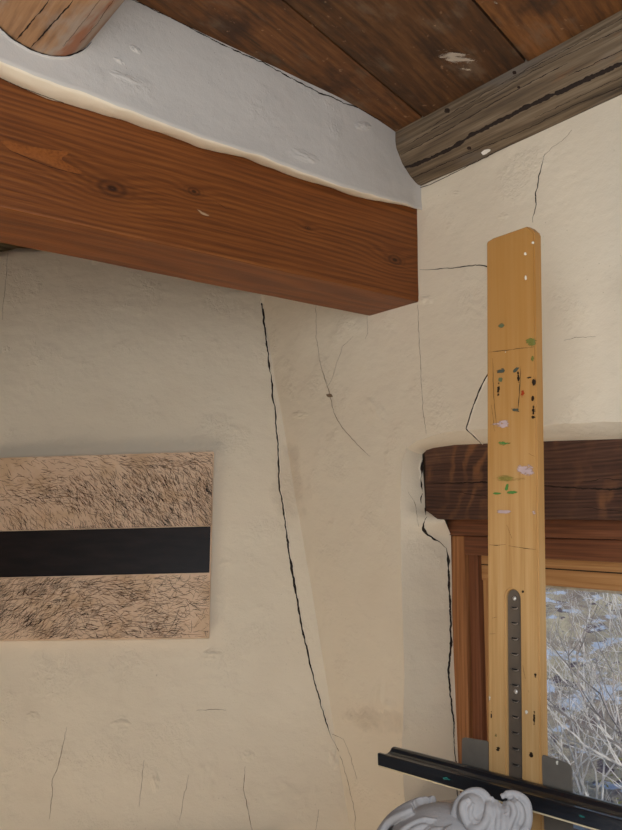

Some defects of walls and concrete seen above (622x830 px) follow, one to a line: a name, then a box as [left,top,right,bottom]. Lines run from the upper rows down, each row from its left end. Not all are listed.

crack [420,139,523,188]
crack [316,339,368,455]
crack [466,373,488,445]
crack [544,478,622,512]
crack [261,303,357,812]
crack [408,460,488,762]